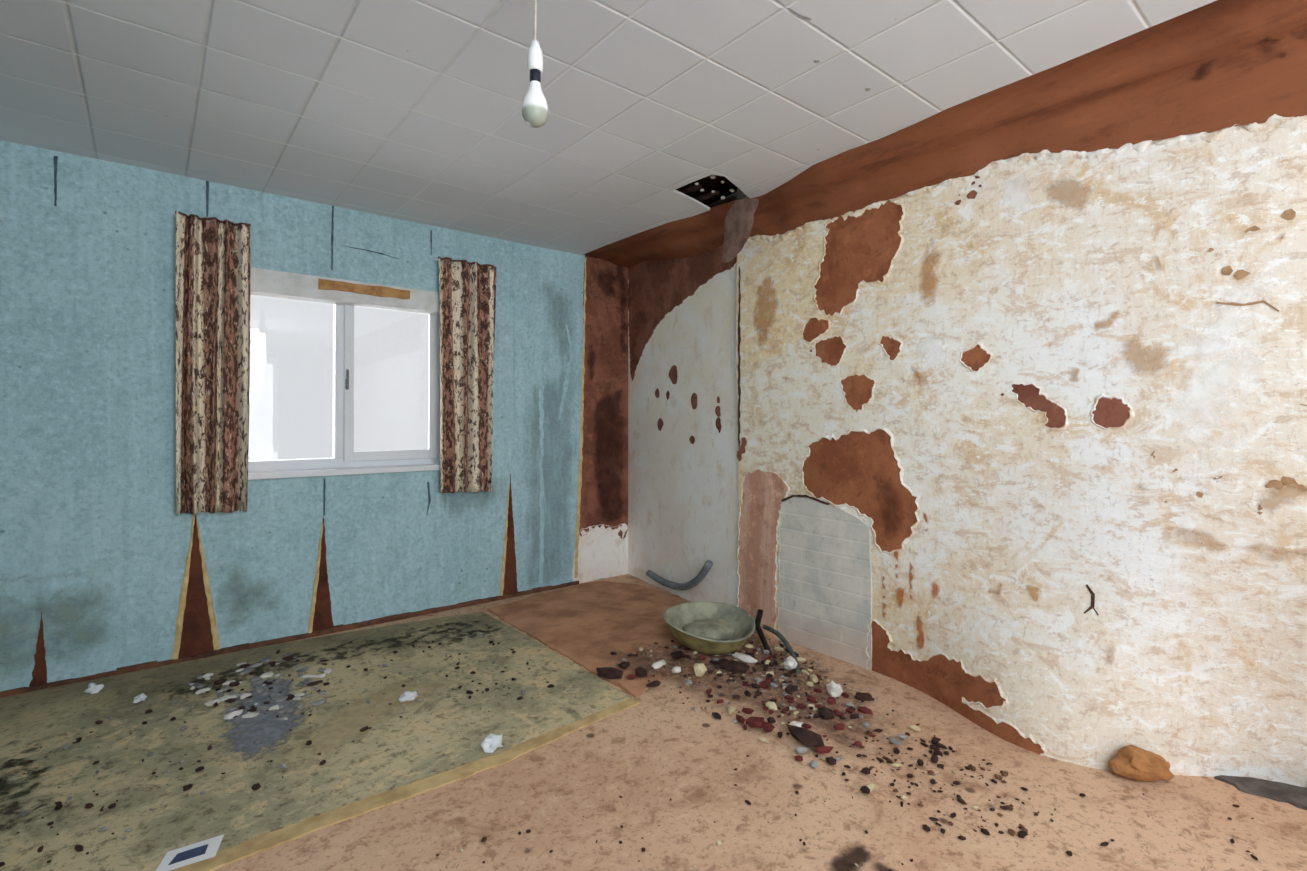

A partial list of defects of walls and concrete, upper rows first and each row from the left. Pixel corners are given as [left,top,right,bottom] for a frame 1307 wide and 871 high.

flaking render [573,0,1307,637]
flaking render [865,619,1047,756]